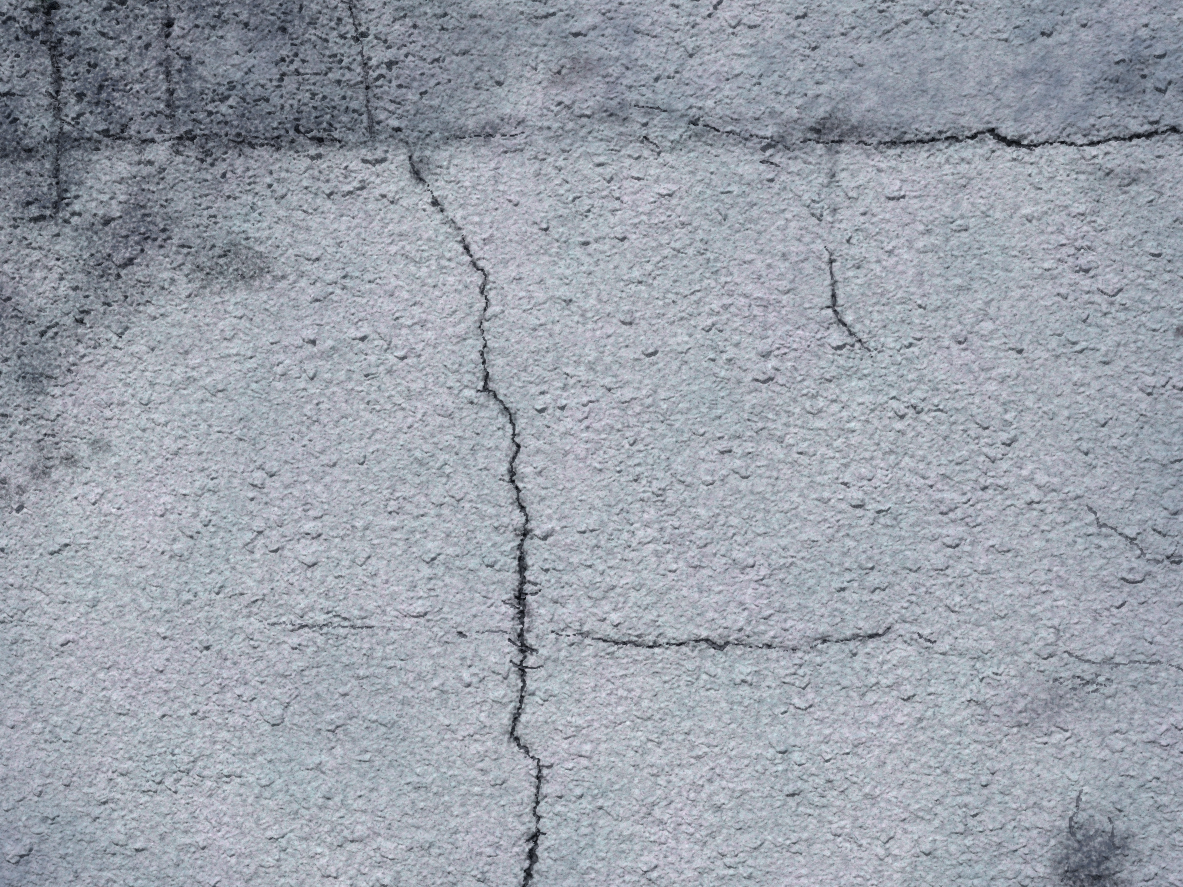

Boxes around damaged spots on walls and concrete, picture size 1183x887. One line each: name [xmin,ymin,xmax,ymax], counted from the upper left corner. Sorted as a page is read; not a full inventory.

crack [0,0,341,212]
leakage [0,0,354,225]
crack [334,0,372,138]
crack [447,132,525,140]
crack [634,105,1183,167]
leakage [79,176,173,288]
leakage [0,282,50,395]
crack [404,138,937,887]
crack [1087,505,1183,565]
crack [258,619,375,630]
crack [1063,651,1183,672]
crack [1061,789,1083,882]